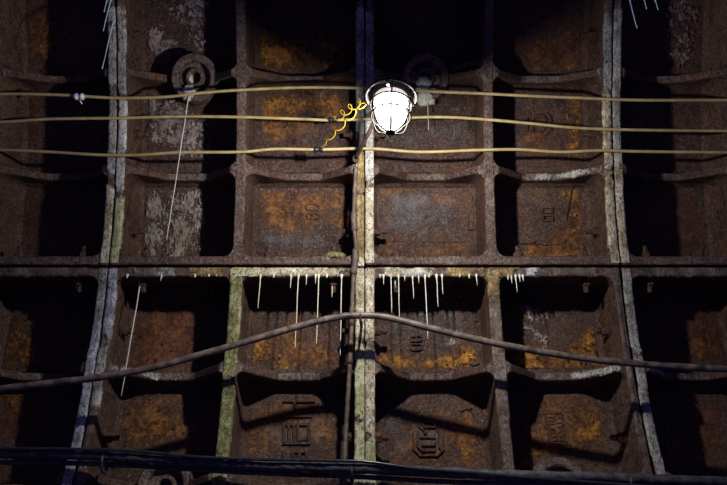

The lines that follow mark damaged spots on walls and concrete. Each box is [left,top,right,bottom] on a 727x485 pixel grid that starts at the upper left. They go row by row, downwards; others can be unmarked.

corrosion [262,93,350,142]
corrosion [262,190,347,233]
water stain [354,4,435,461]
corrosion [133,308,198,368]
corrosion [253,331,338,369]
corrosion [380,345,476,369]
water stain [445,267,600,421]
corrosion [514,329,598,368]
corrosion [122,393,191,450]
corrosion [386,408,481,467]
corrosion [524,395,603,463]
water stain [354,474,376,485]